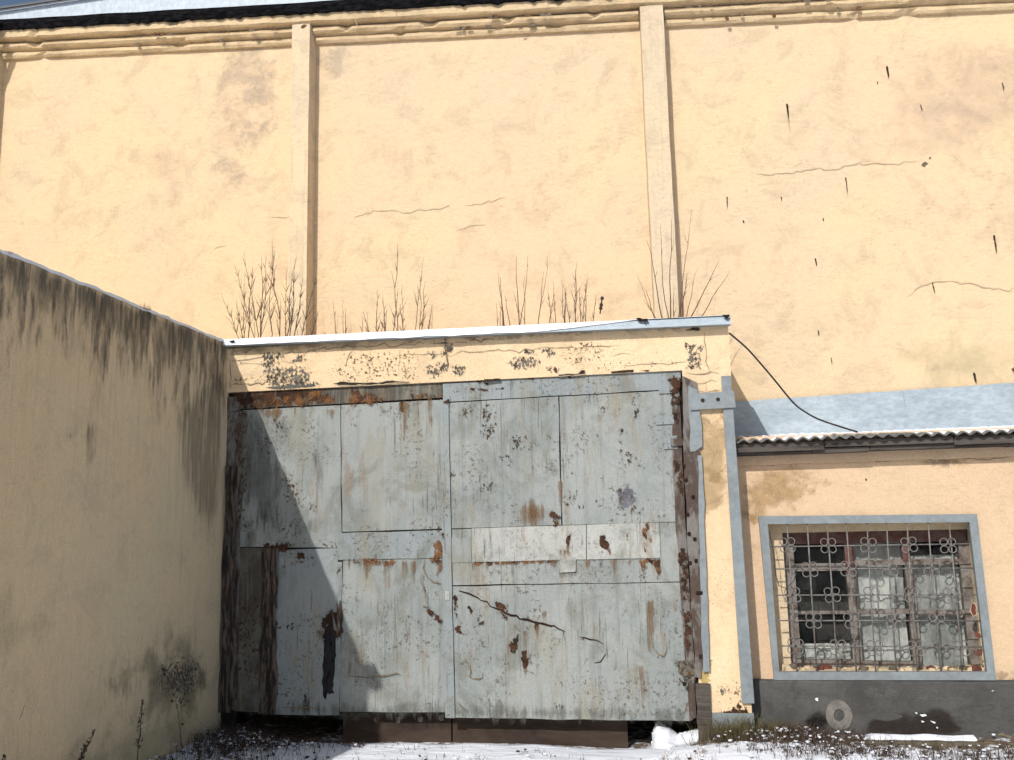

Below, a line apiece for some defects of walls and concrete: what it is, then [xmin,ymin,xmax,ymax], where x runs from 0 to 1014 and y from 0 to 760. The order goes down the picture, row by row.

leakage [0,261,226,399]
peeling [231,343,465,391]
peeling [508,337,656,377]
peeling [685,327,704,370]
corrosion [230,389,335,421]
corrosion [668,376,682,423]
corrosion [472,534,571,567]
corrosion [599,535,616,569]
corrosion [628,523,661,579]
crack [418,550,606,663]
corrosion [678,546,692,652]
corrosion [508,612,546,671]